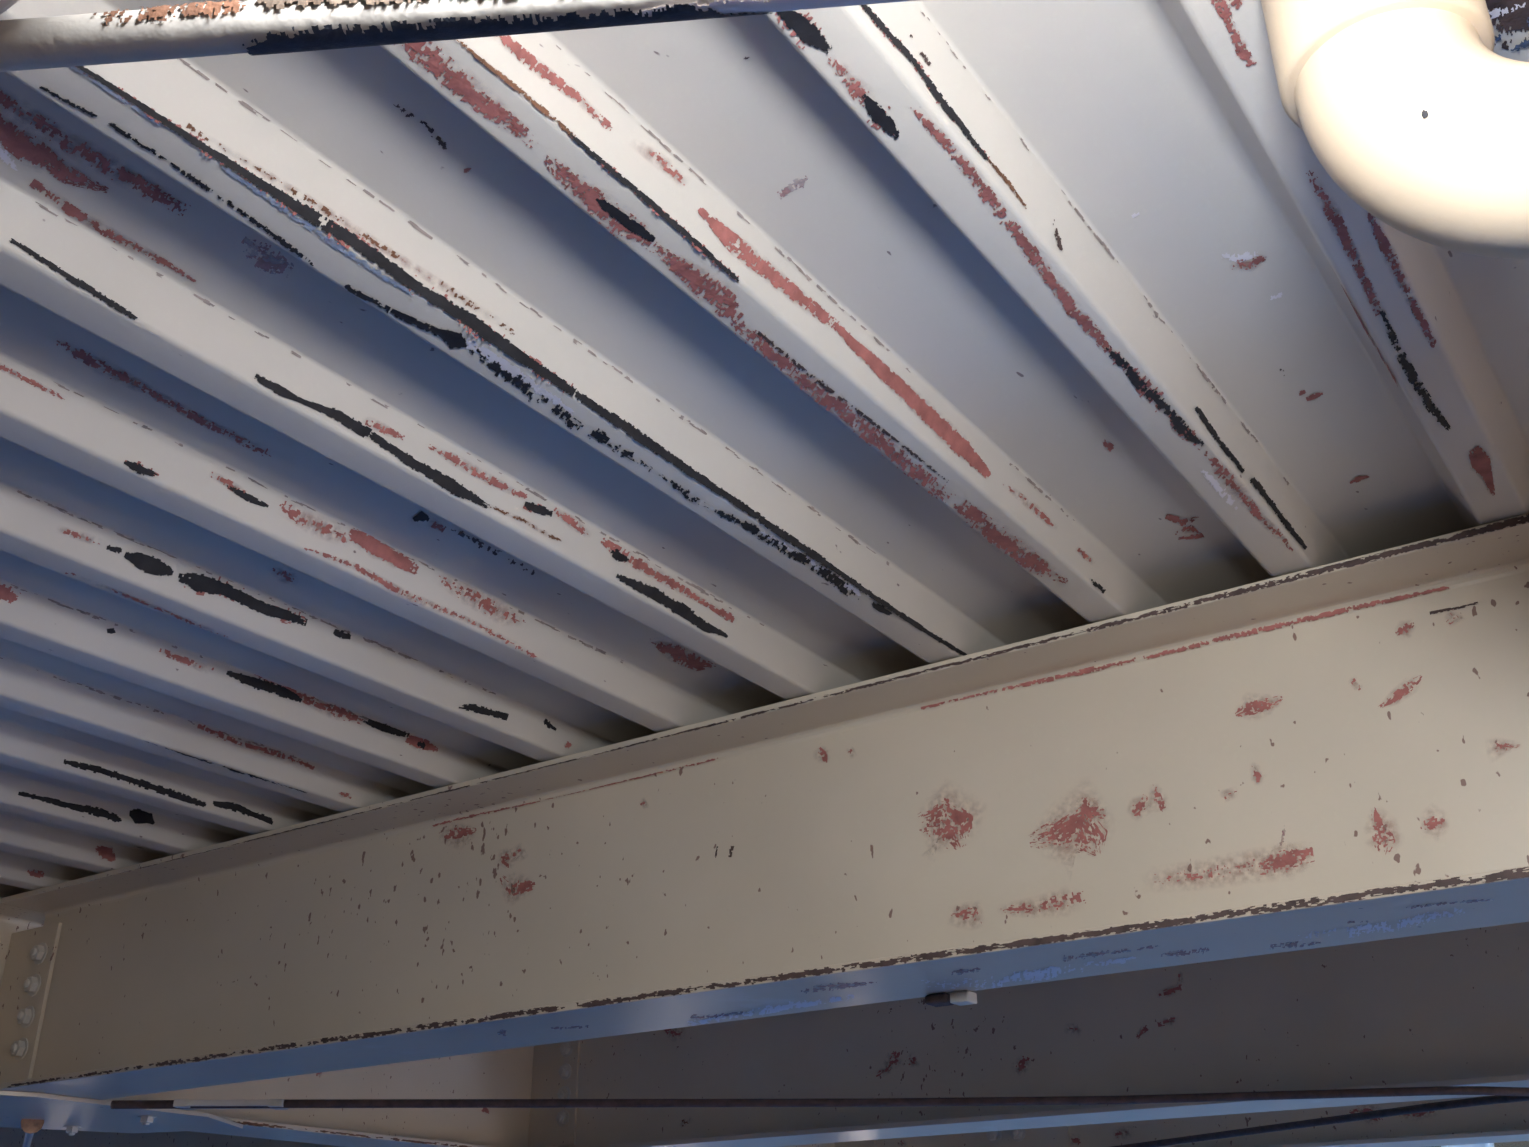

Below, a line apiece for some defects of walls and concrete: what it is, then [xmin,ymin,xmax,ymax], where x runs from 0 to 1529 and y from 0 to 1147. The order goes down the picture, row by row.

rust [93,0,421,25]
rust [457,40,576,137]
peeling [0,90,215,307]
peeling [10,238,159,337]
peeling [39,4,1068,658]
peeling [861,0,1307,551]
peeling [0,365,65,400]
rust [490,506,561,541]
peeling [0,584,21,604]
peeling [651,642,716,671]
rust [91,514,1529,881]
rust [8,867,1529,1088]